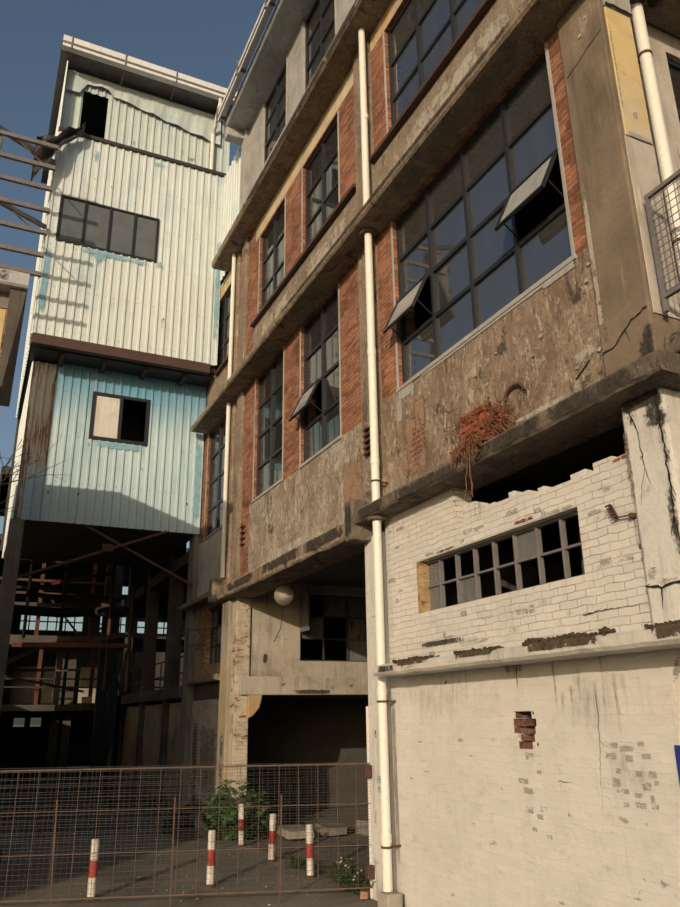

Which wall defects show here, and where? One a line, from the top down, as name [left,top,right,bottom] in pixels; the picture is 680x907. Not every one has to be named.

flaking render [465,341,508,404]
crack [575,306,647,380]
flaking render [403,396,443,478]
spalling [570,469,593,480]
crack [628,390,680,539]
crack [583,580,680,616]
spalling [514,711,539,749]